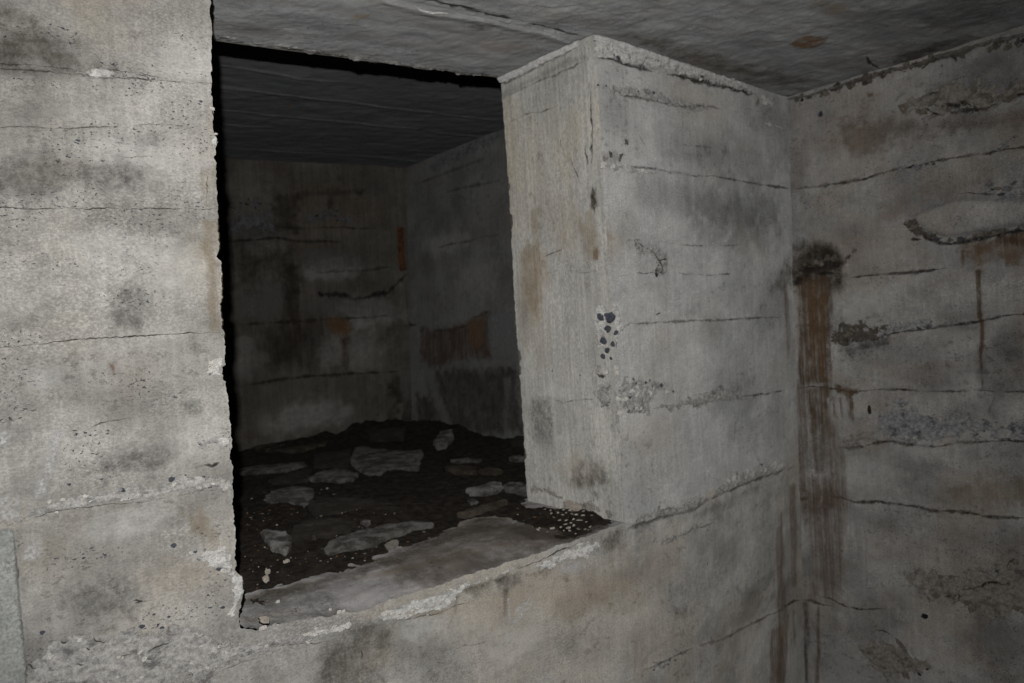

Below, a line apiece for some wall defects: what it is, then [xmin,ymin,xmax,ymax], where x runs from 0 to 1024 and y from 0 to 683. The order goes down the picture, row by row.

crack [819,146,1024,187]
corrosion [962,233,1024,383]
crack [8,332,207,347]
spalling [831,319,938,346]
spalling [594,304,742,417]
corrosion [792,242,858,595]
crack [837,497,1020,519]
spalling [534,539,600,570]
spalling [378,568,514,621]
peeling [299,608,352,637]